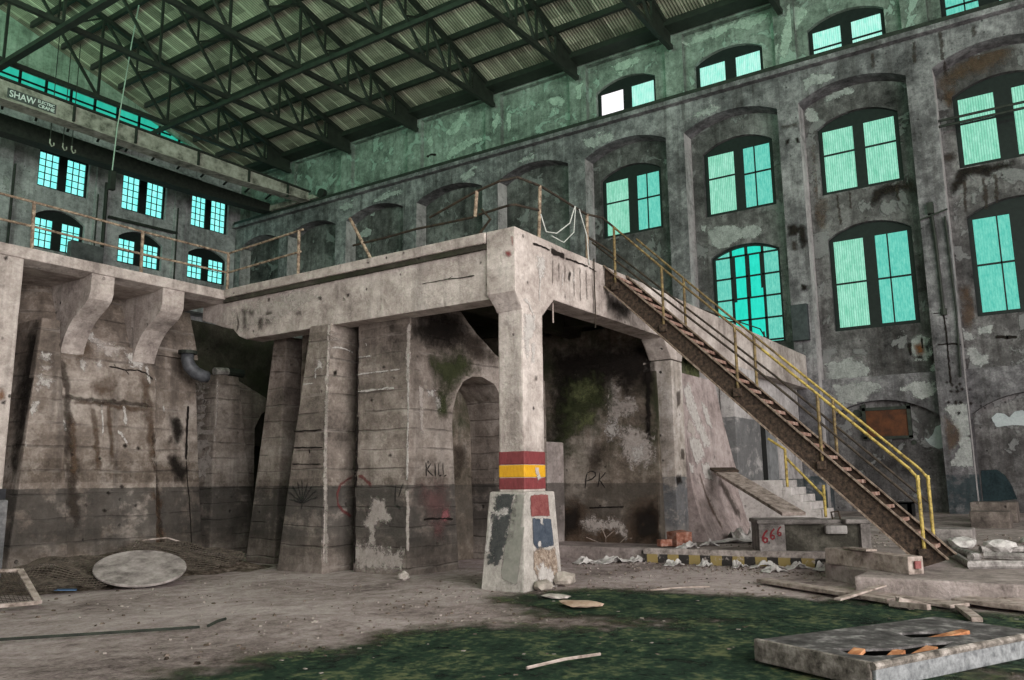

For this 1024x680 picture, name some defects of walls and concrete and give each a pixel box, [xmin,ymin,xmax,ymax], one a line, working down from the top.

peeling [445,111,483,160]
peeling [492,113,511,131]
peeling [546,83,583,115]
peeling [583,131,614,148]
water stain [61,333,163,543]
water stain [358,314,491,551]
water stain [551,342,655,470]
peeling [825,357,882,406]
peeling [992,410,1024,427]
peeling [355,499,405,570]